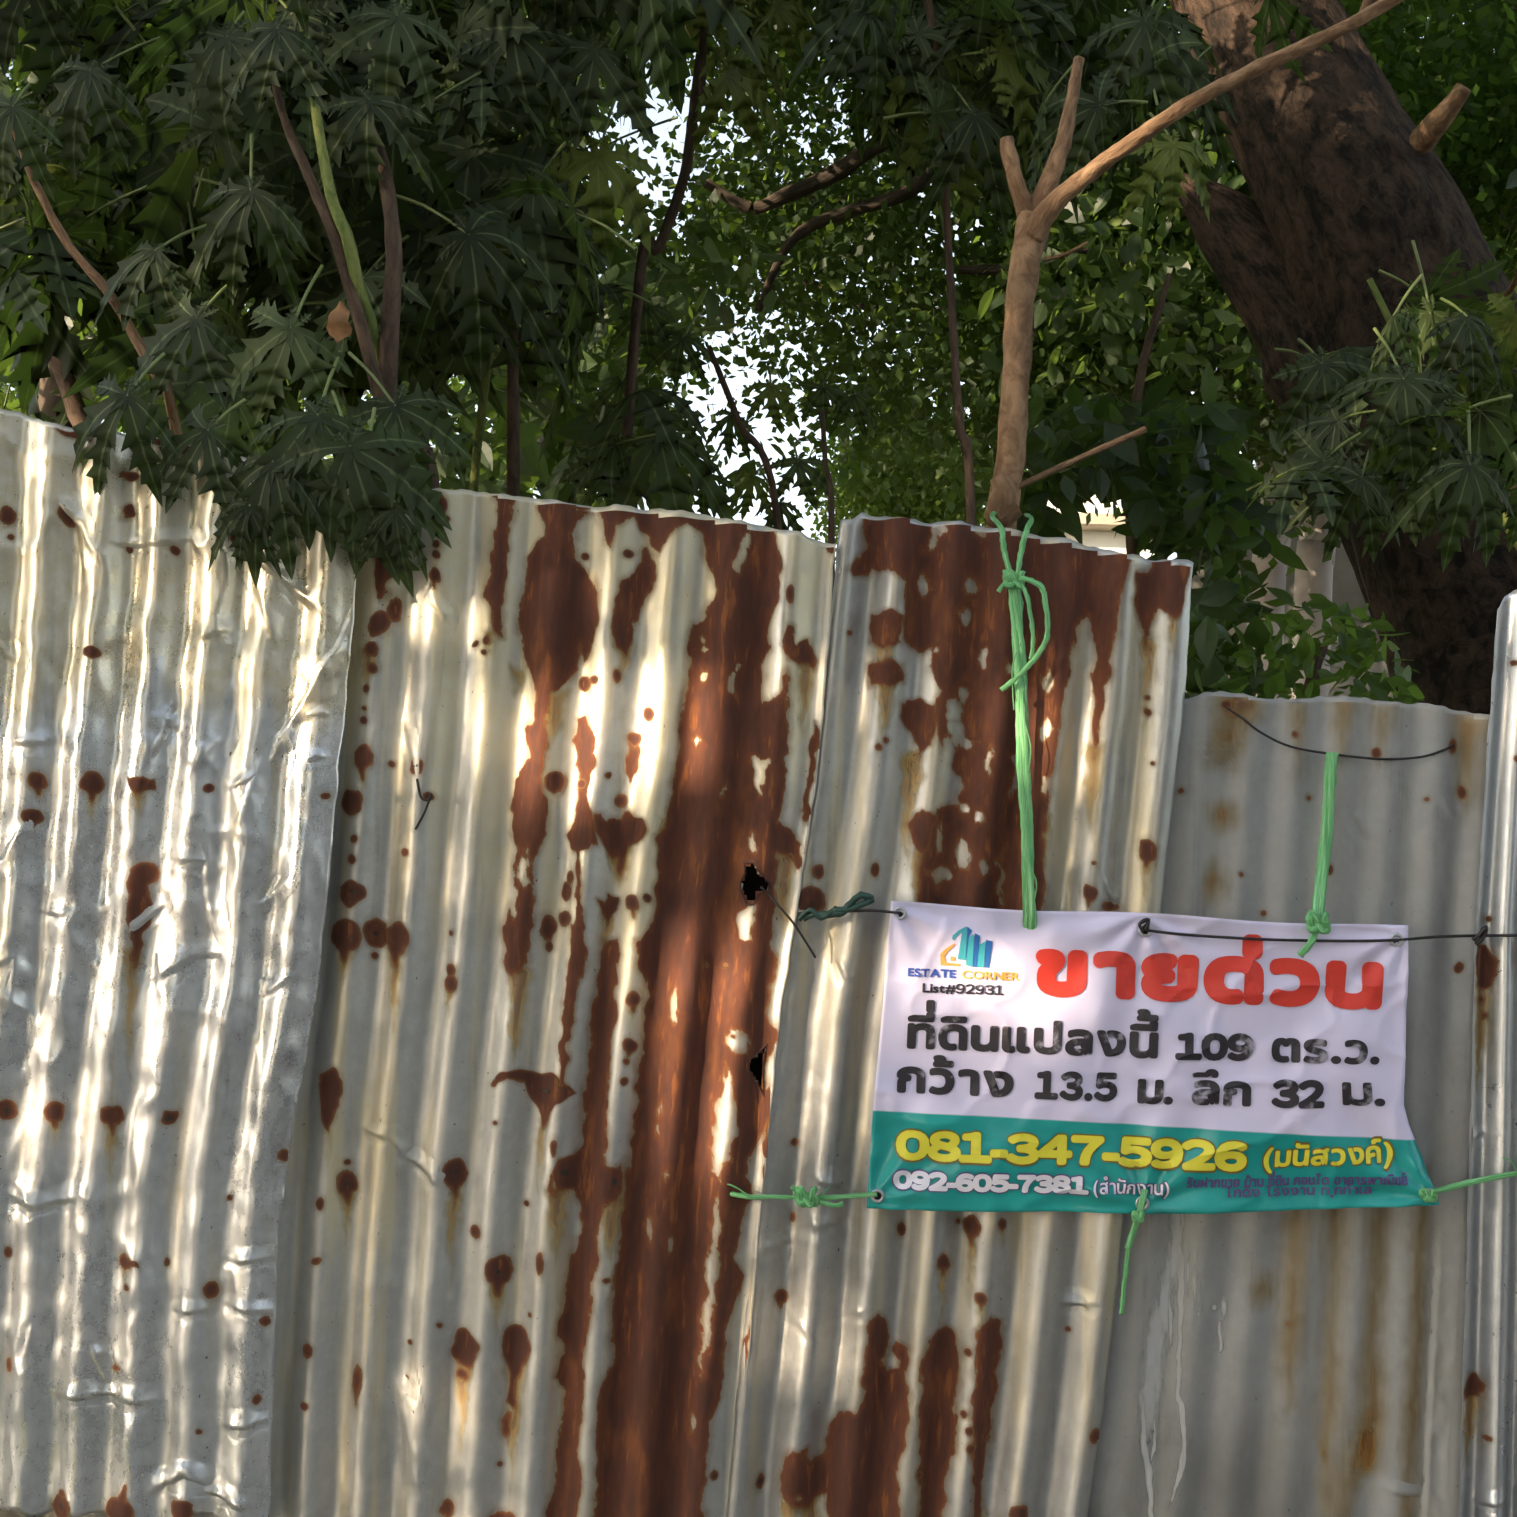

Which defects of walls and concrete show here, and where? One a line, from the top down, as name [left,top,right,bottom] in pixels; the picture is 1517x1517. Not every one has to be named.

rust [20,772,48,828]
rust [79,770,105,813]
rust [126,776,156,809]
rust [360,558,402,724]
rust [847,518,1191,912]
rust [125,862,160,1036]
rust [331,834,409,1010]
rust [472,495,826,1517]
rust [1454,944,1499,1078]
rust [43,1101,65,1133]
rust [436,1323,480,1428]
rust [756,1292,1003,1517]